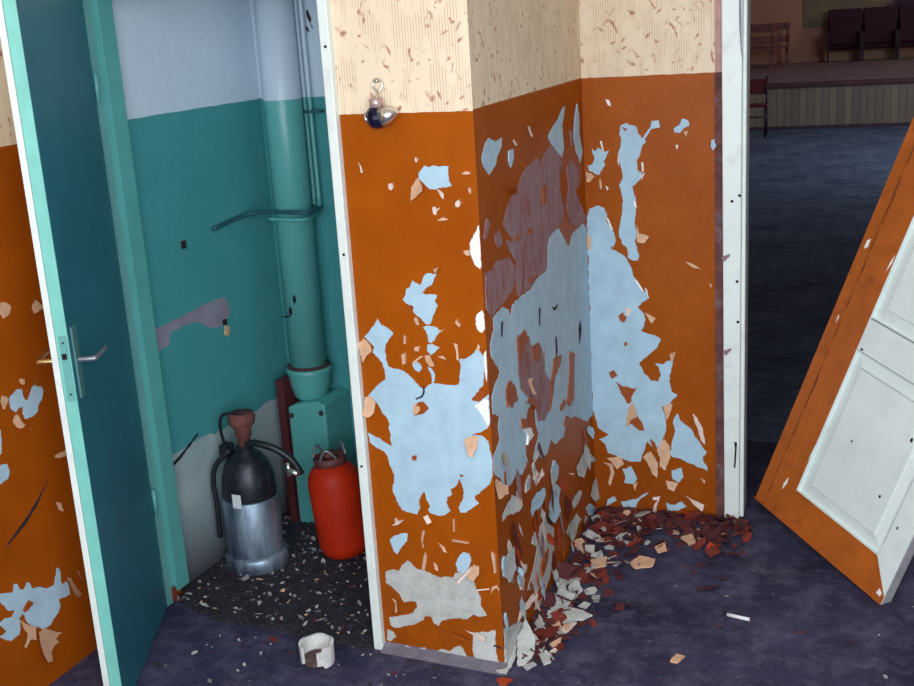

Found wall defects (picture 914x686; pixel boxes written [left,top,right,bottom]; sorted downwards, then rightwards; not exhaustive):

peeling [0,302,11,318]
peeling [1,378,44,431]
peeling [359,104,708,663]
peeling [0,430,10,484]
spalling [7,481,47,545]
peeling [0,568,82,663]